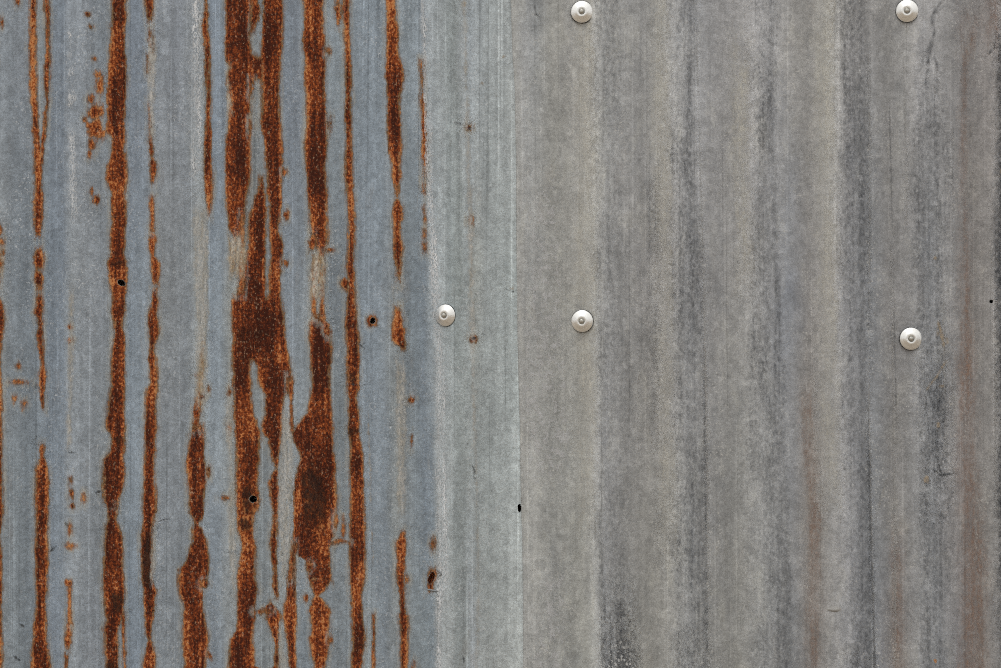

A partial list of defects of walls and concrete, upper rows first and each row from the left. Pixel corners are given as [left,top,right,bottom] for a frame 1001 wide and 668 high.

corrosion [0,299,27,668]
corrosion [15,0,51,409]
corrosion [30,444,52,668]
corrosion [64,579,73,668]
corrosion [82,0,128,668]
corrosion [142,0,157,182]
corrosion [140,194,161,668]
corrosion [176,0,378,668]
corrosion [384,0,405,290]
corrosion [391,302,407,350]
corrosion [393,529,416,668]
corrosion [418,17,438,319]